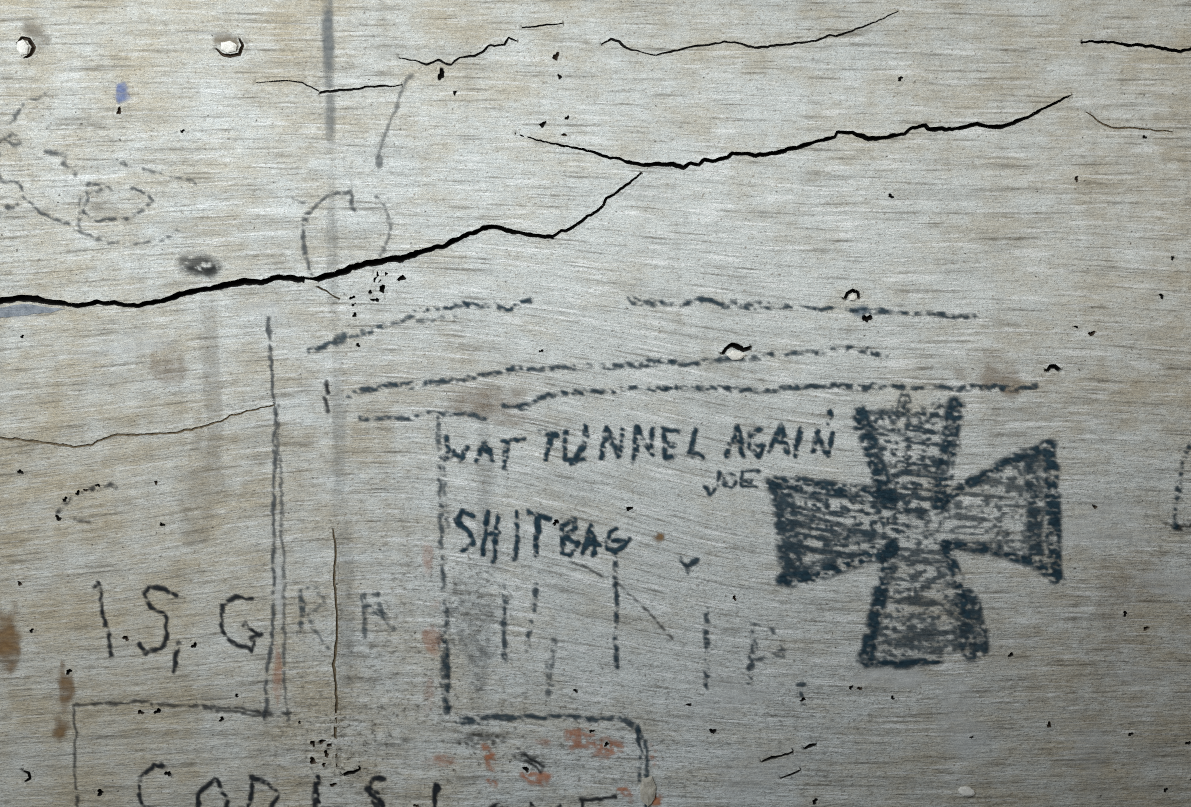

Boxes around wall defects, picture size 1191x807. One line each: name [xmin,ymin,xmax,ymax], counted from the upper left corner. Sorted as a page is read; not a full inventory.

crack [0,91,1173,318]